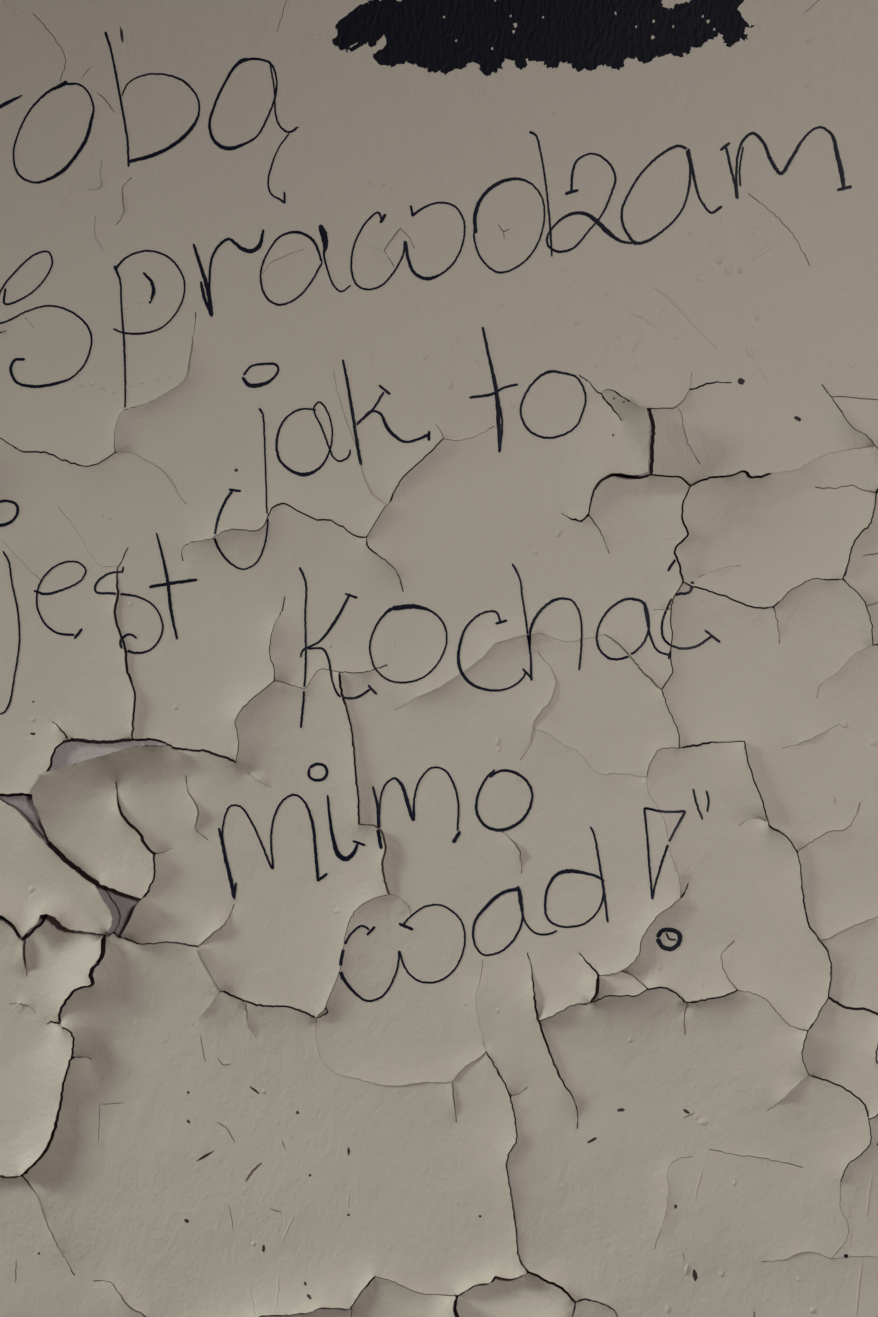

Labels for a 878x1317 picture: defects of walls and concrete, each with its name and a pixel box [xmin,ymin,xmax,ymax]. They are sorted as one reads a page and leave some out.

crack [0,506,618,1317]
crack [181,371,494,592]
peeling [0,293,878,1317]
crack [395,372,878,1262]